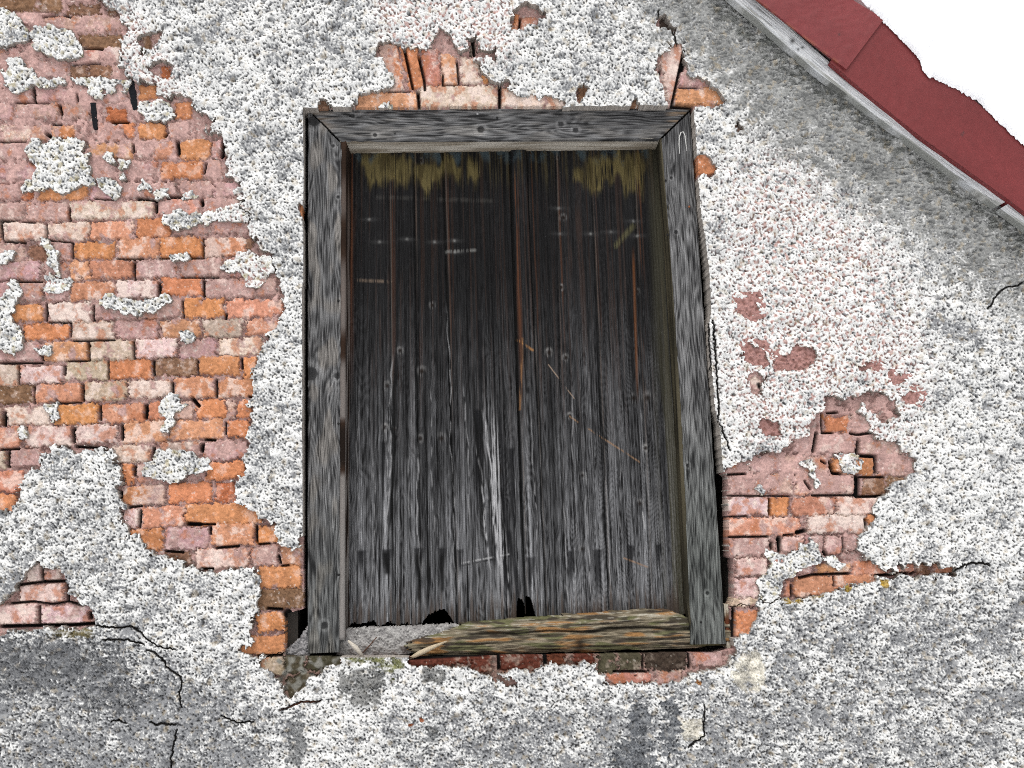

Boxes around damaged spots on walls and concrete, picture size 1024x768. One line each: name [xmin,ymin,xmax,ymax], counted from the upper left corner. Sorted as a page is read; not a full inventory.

spalling [352,29,587,110]
spalling [655,19,724,115]
crack [987,282,1023,309]
spalling [0,0,342,698]
spalling [407,356,952,687]
crack [952,561,991,572]
crack [96,625,182,768]